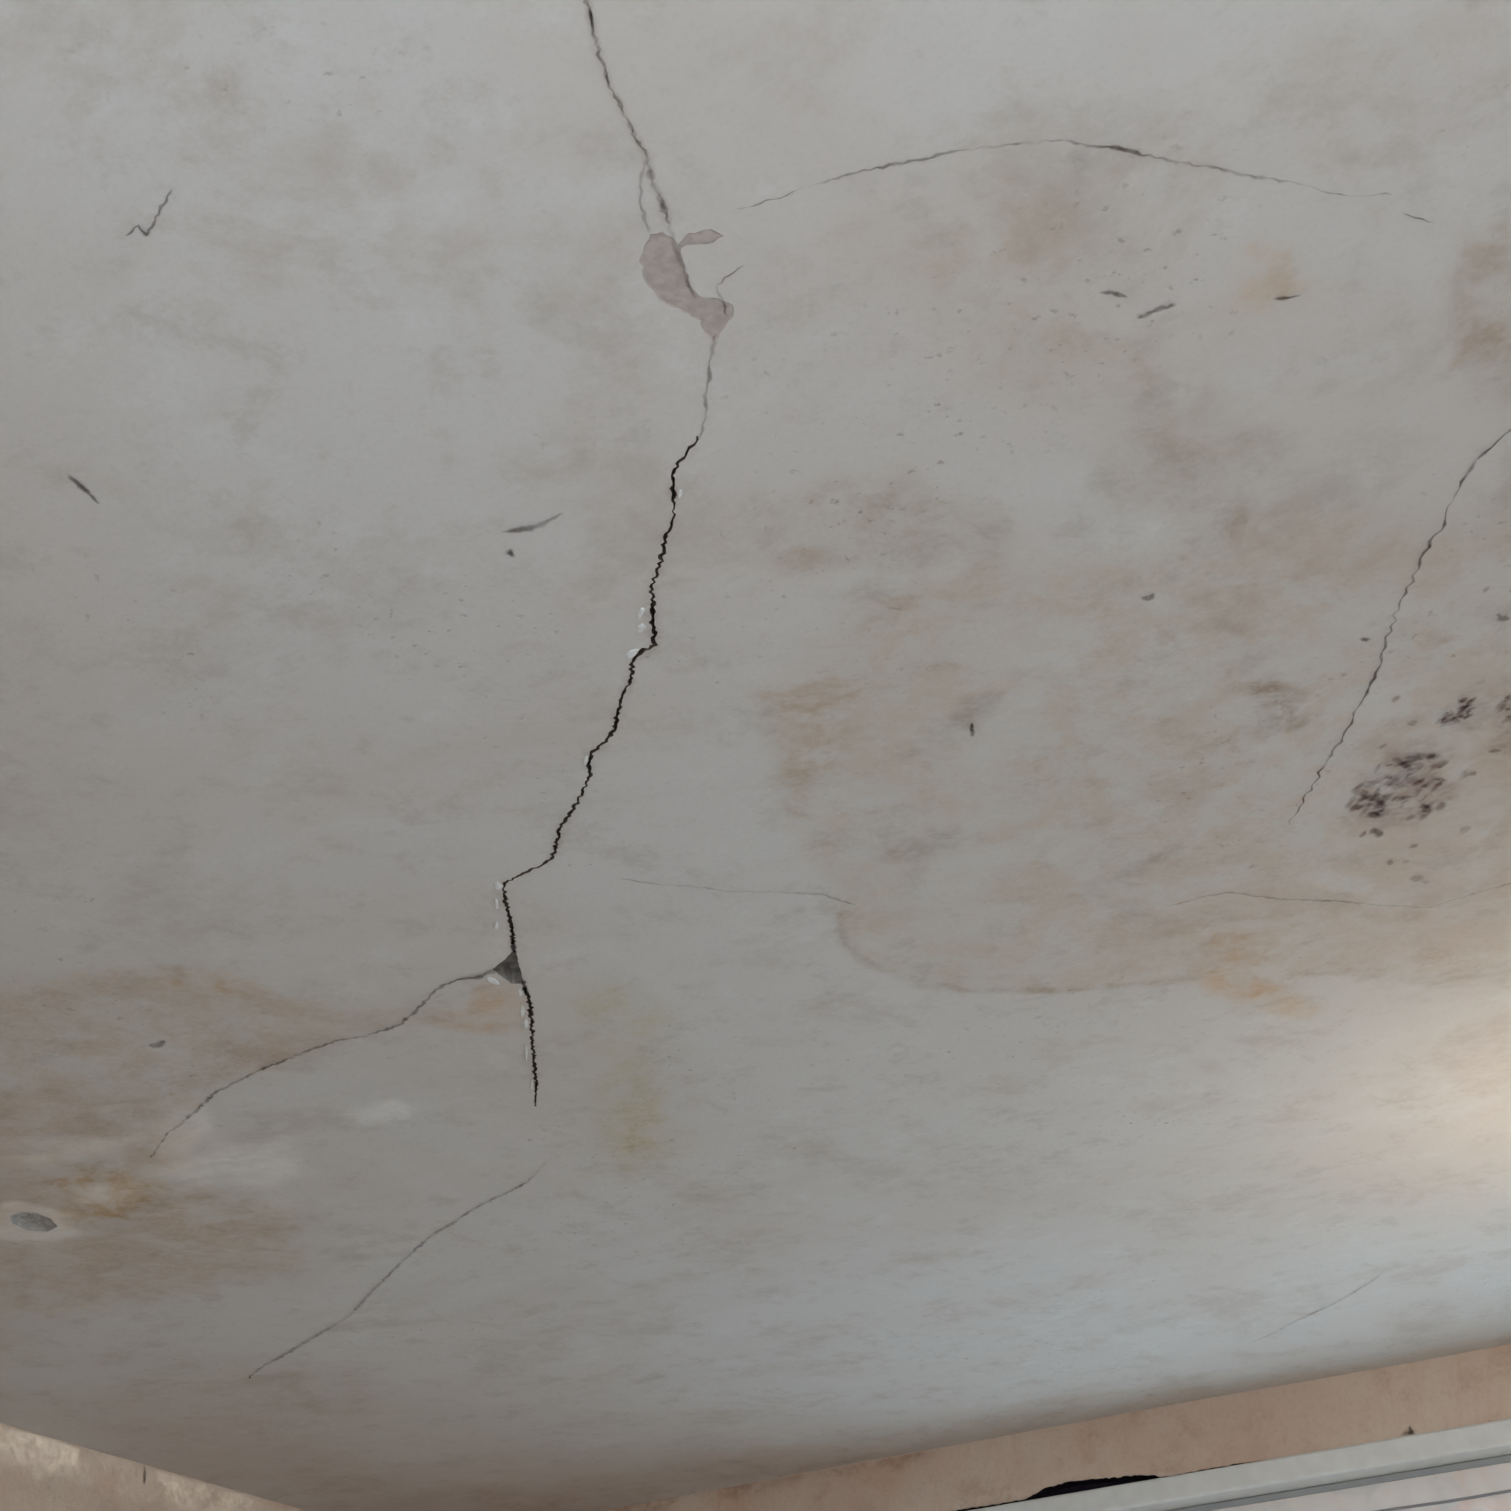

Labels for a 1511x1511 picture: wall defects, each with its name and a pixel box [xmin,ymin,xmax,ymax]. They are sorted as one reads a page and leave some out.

crack [1104,145,1138,153]
spalling [639,229,734,341]
crack [1400,521,1446,601]
crack [1342,635,1387,738]
crack [448,436,699,1106]